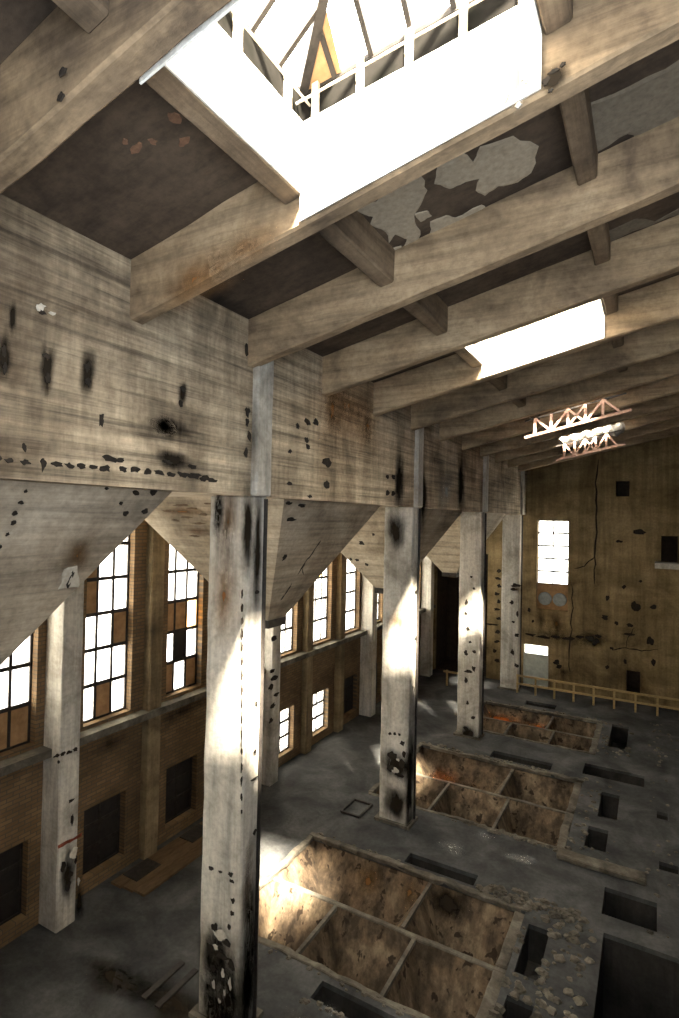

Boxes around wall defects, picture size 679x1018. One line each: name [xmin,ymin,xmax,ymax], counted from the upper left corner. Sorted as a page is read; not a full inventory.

peeling [357,136,539,250]
peeling [202,898,239,1018]